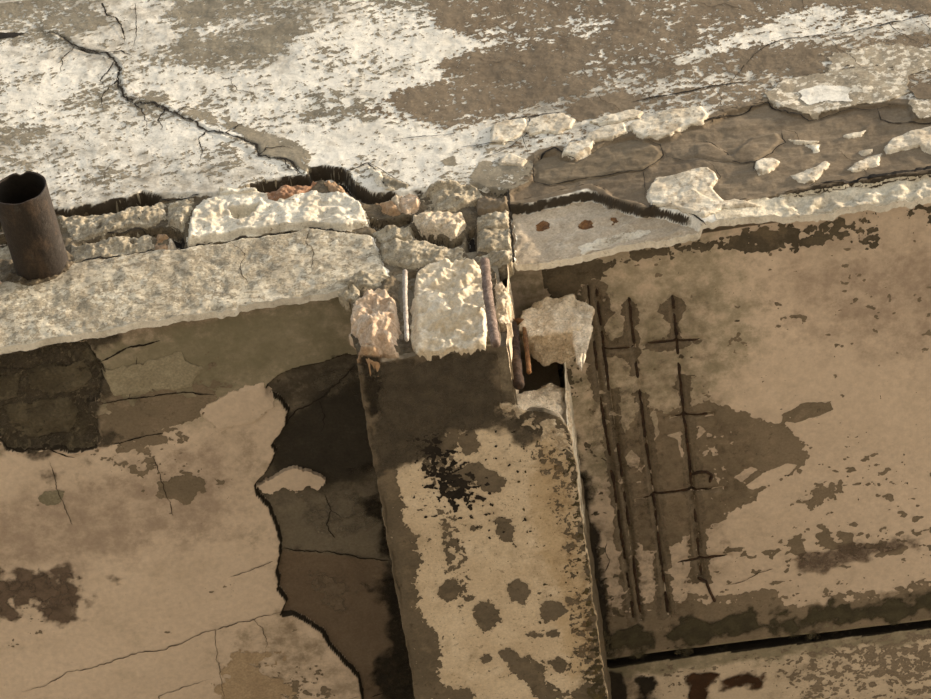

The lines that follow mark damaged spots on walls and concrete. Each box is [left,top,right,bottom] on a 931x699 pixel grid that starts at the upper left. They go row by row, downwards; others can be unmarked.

crack [0,3,310,185]
peeling [0,0,931,218]
crack [393,0,931,207]
peeling [0,228,386,346]
crack [507,189,515,263]
water stain [0,563,81,624]
crack [23,612,281,699]
water stain [369,574,415,699]
spalling [258,354,528,699]
water stain [359,351,549,497]
peeling [479,211,931,699]
corrosion [685,672,765,699]